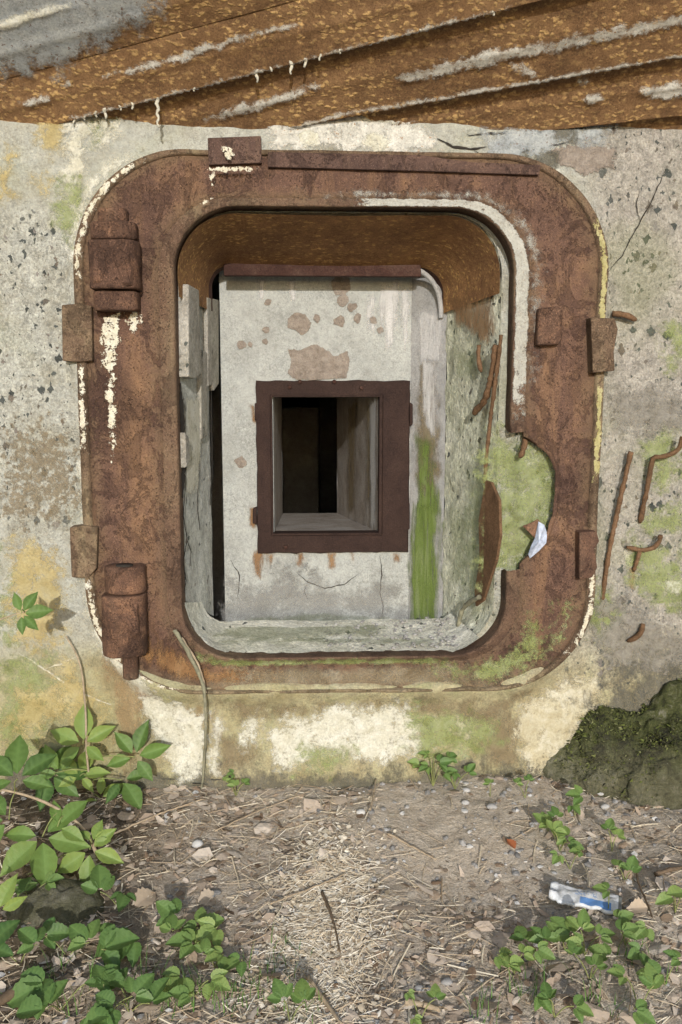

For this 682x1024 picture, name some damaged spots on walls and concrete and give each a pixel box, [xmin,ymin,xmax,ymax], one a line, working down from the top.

crack [437,127,587,153]
crack [609,167,667,271]
spalling [237,327,269,349]
flaking render [287,312,350,380]
corrosion [452,298,495,342]
peeling [78,364,90,455]
peeling [100,312,143,463]
corrosion [348,403,370,511]
corrosion [253,551,272,577]
crack [296,559,384,618]
corrosion [143,637,247,683]
leakage [83,596,682,791]